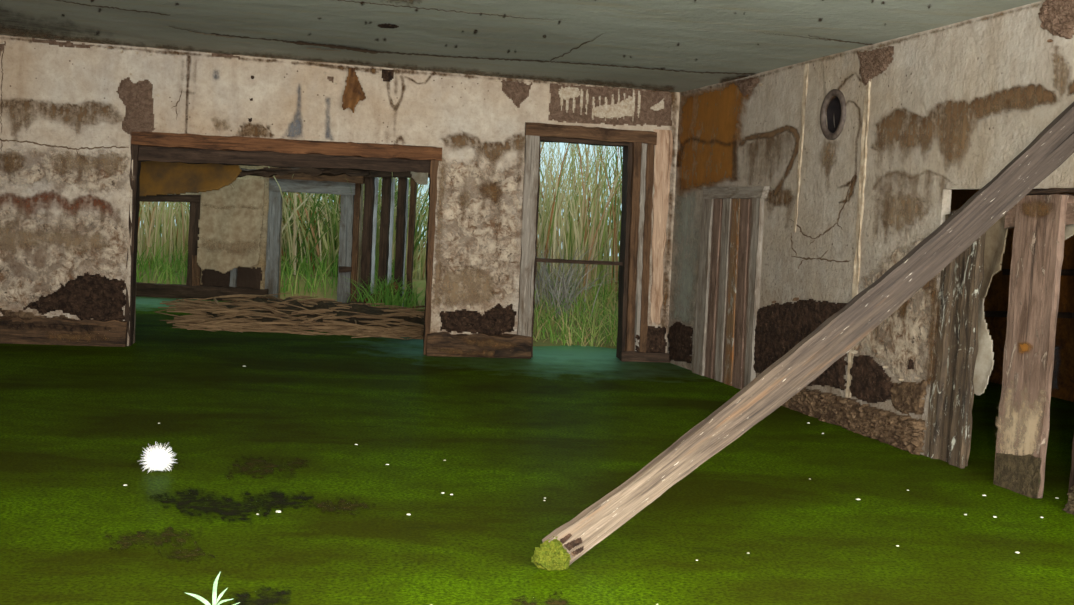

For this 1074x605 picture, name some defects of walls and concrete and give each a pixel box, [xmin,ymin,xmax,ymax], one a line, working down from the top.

flaking render [1038,0,1074,42]
flaking render [115,73,160,136]
leakage [0,11,800,207]
leakage [872,46,1074,162]
peeling [0,211,128,322]
peeling [437,160,524,335]
flaking render [496,79,693,363]
crack [790,175,855,269]
flaking render [753,297,847,373]
flaking render [781,282,932,455]
peeling [1051,346,1060,389]
flaking render [1061,486,1074,515]